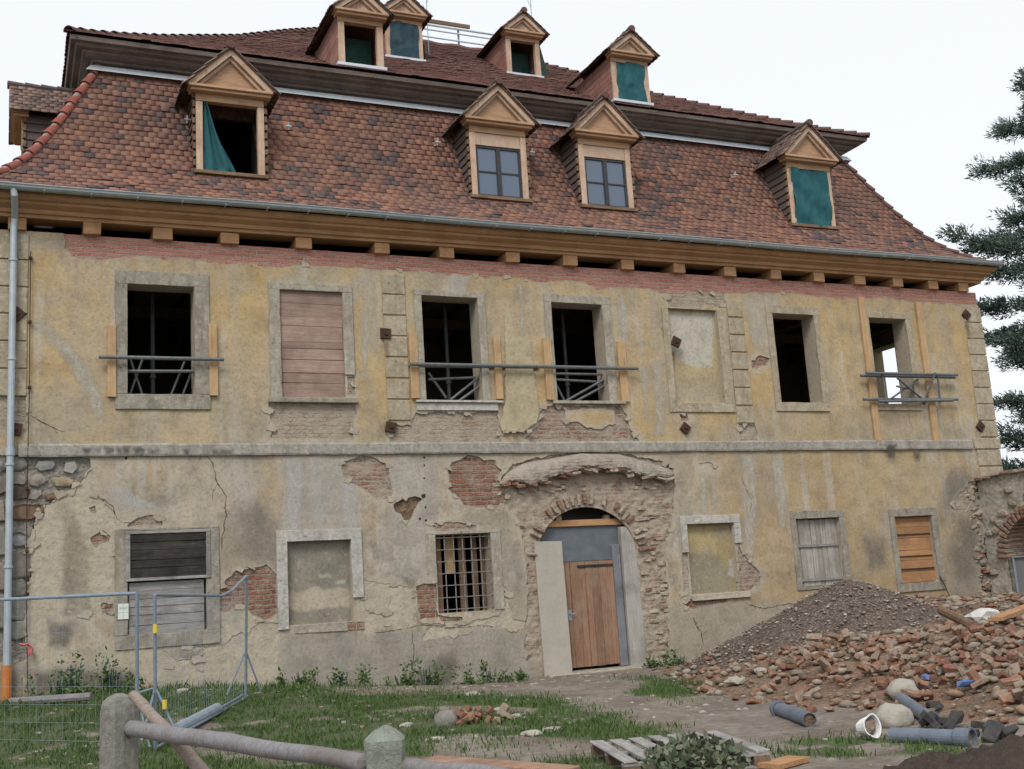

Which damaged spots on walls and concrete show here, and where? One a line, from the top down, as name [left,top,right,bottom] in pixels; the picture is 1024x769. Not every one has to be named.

flaking render [0,455,166,664]
crack [200,456,229,546]
flaking render [157,564,281,673]
flaking render [339,455,421,526]
flaking render [359,404,727,661]
flaking render [736,548,762,591]